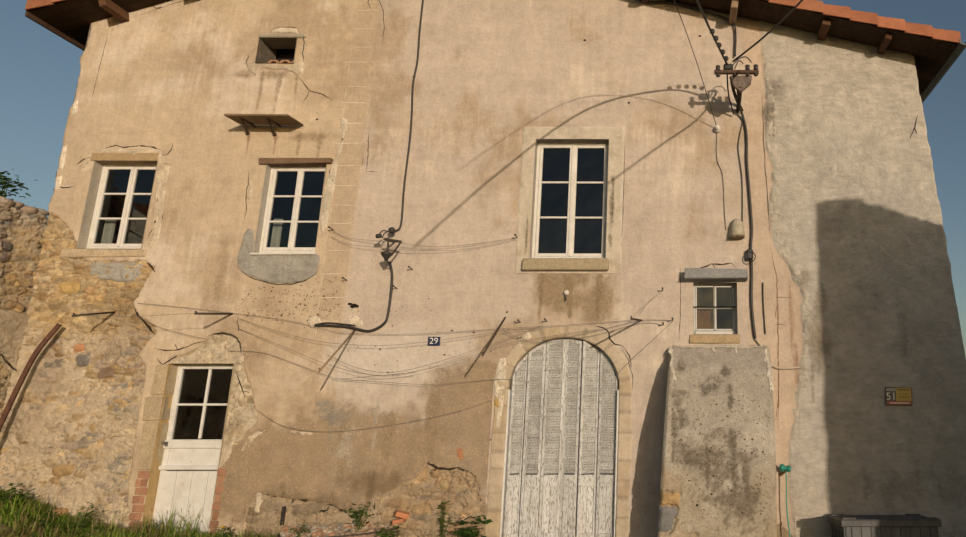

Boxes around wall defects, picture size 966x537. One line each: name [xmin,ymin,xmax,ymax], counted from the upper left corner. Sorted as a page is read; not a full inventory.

crack [273,27,332,100]
spalling [54,145,67,190]
flaking render [80,147,169,248]
spalling [0,213,156,530]
flaking render [167,334,312,468]
spalling [245,445,489,537]
leakage [680,433,757,516]